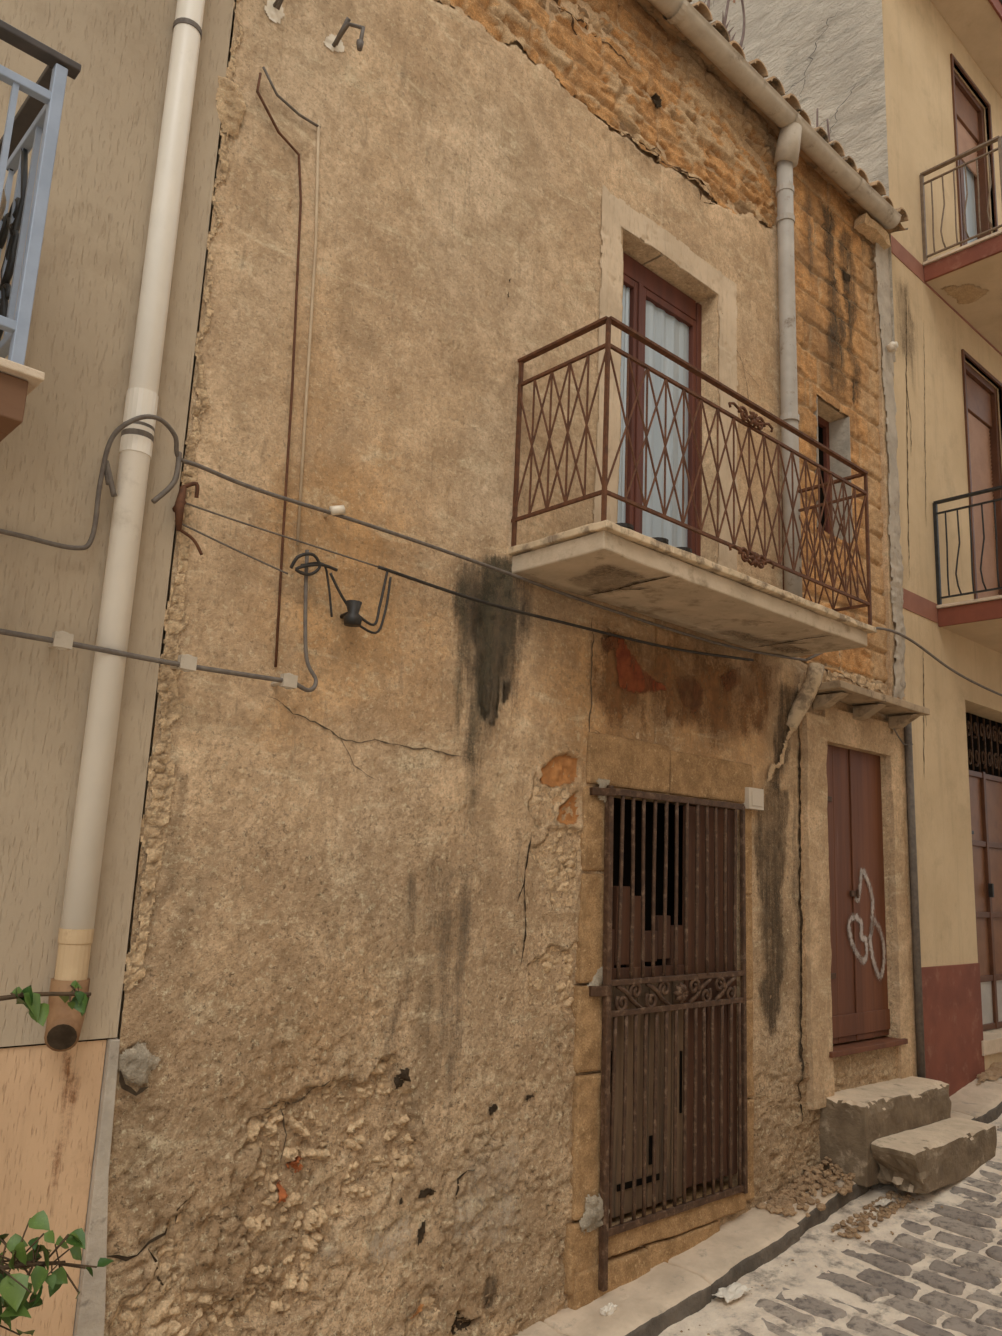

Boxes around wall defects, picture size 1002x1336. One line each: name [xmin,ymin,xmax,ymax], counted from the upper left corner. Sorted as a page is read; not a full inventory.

crack [785,11,838,97]
leakage [807,202,861,402]
crack [263,694,463,779]
leakage [455,556,531,763]
peeling [601,633,703,713]
leakage [593,630,809,1033]
crack [517,832,532,963]